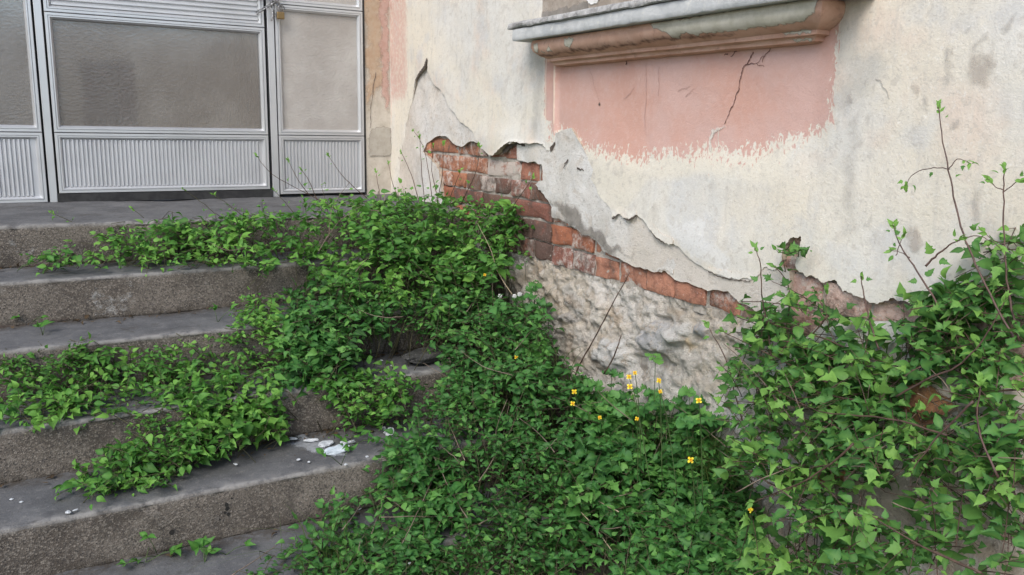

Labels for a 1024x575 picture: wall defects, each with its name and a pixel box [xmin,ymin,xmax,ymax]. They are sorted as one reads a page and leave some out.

peeling [651,0,818,42]
crack [718,48,771,147]
flaking render [396,69,968,373]
flaking render [971,308,1024,337]
flaking render [984,342,1024,391]